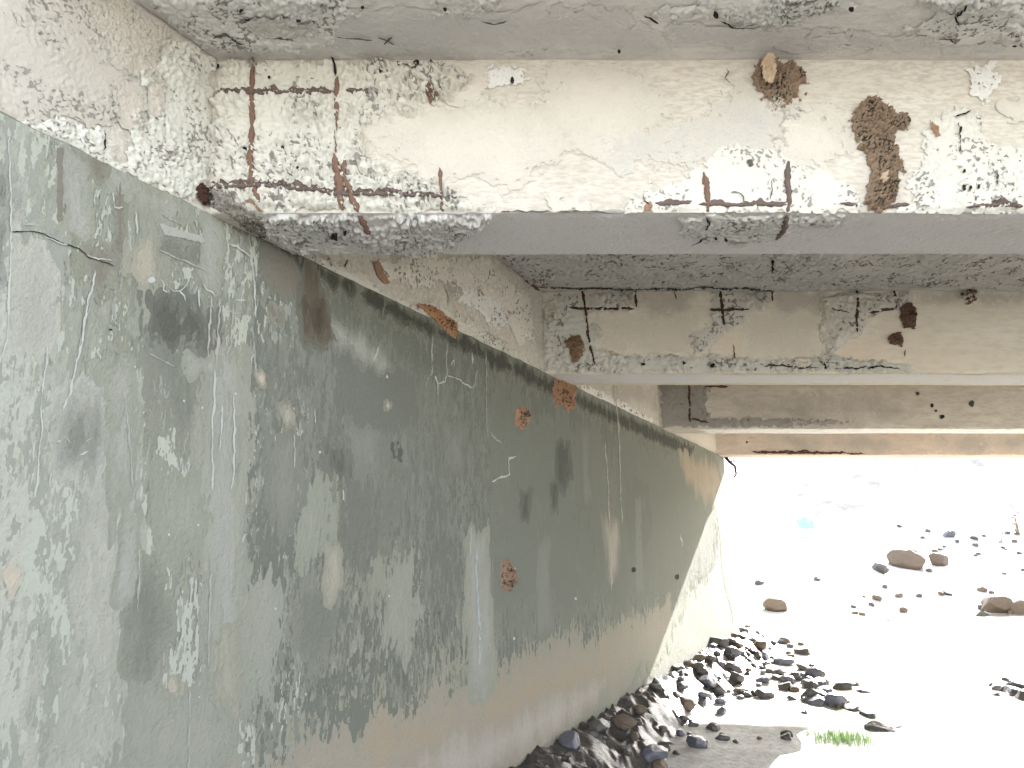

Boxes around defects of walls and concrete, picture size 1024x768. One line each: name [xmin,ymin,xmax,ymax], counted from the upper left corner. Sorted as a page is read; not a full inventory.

crack [0,137,114,410]
leakage [182,267,196,295]
leakage [223,222,247,301]
spalling [0,0,1024,428]
leakage [255,209,1024,258]
leakage [585,306,701,359]